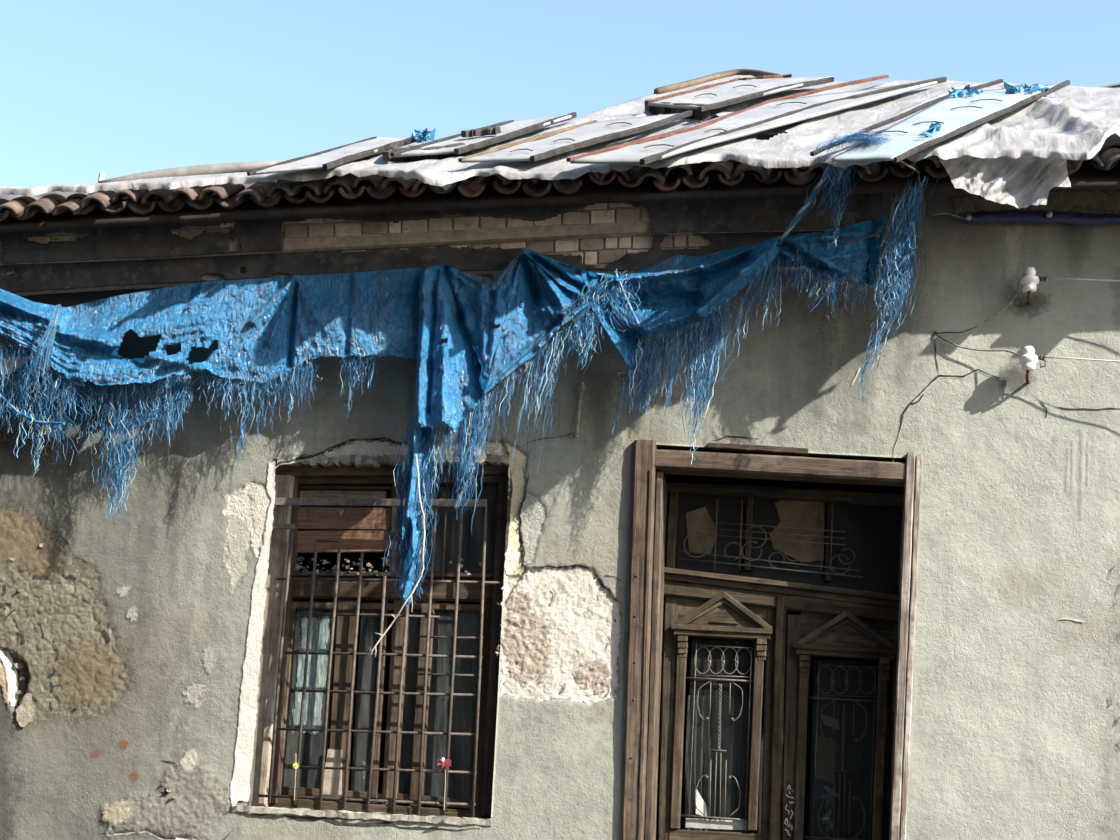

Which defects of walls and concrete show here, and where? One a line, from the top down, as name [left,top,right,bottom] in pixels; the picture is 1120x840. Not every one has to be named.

spalling [277,439,408,469]
crack [892,342,1002,462]
crack [1027,387,1120,417]
spalling [0,499,138,728]
peeling [222,481,270,594]
spalling [430,441,623,705]
crack [525,564,622,622]